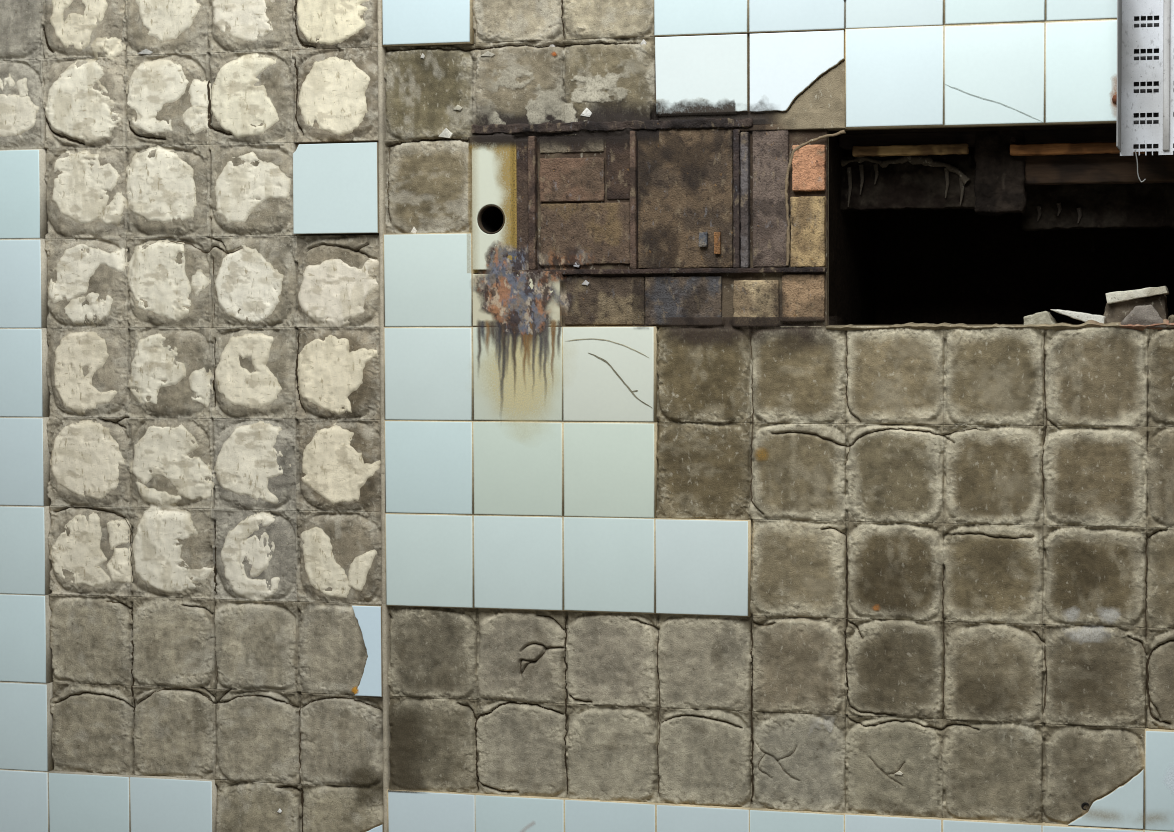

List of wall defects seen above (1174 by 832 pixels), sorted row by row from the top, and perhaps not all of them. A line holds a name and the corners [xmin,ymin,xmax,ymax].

spalling [384,0,1174,326]
crack [946,84,1040,121]
spalling [0,0,384,832]
rust [475,245,590,390]
crack [569,338,652,408]
spalling [388,315,1174,829]
crack [460,615,591,792]